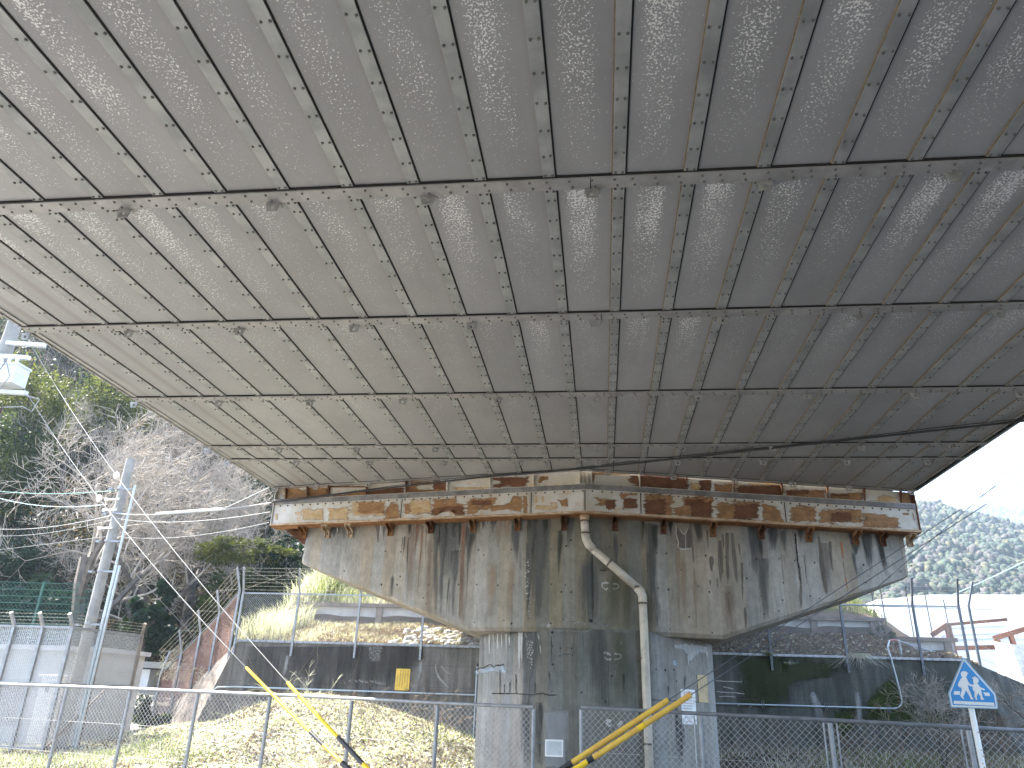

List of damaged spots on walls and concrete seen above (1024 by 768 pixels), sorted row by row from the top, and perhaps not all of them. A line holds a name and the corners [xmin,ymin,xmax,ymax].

rust [283,476,568,588]
damp [434,521,496,600]
damp [512,518,574,617]
damp [582,555,596,609]
damp [642,521,673,607]
damp [690,523,786,628]
rust [592,472,915,528]
damp [798,530,833,594]
damp [849,533,886,572]